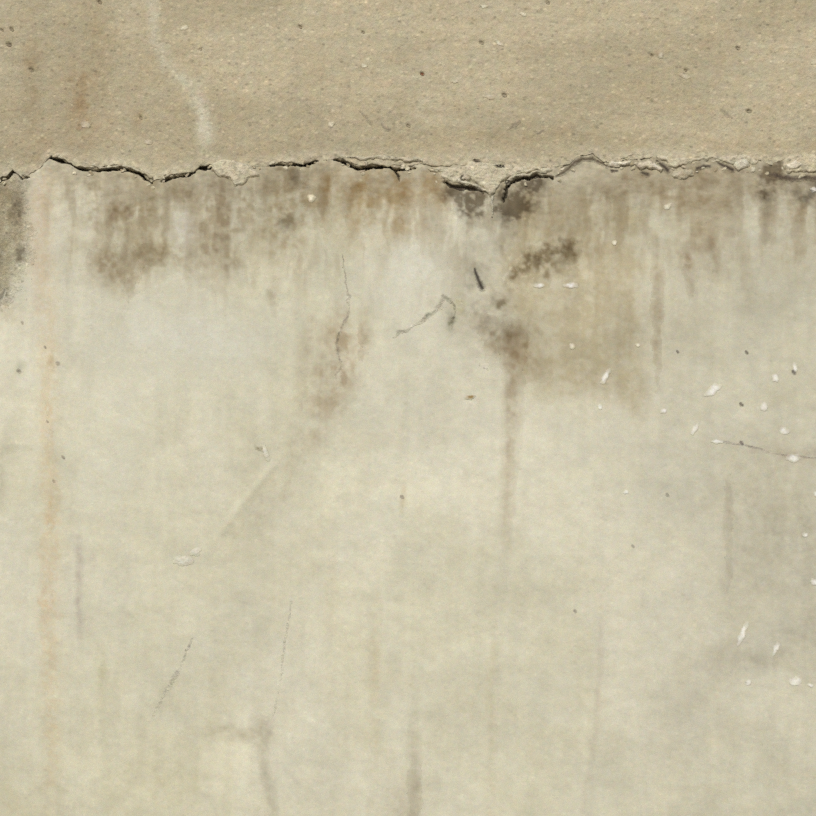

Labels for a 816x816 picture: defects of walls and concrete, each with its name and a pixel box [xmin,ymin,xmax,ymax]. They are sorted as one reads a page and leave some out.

leakage [392,119,816,157]
crack [50,157,211,182]
crack [270,159,415,178]
crack [444,182,477,191]
crack [503,156,619,203]
crack [640,159,671,178]
crack [695,162,736,173]
crack [767,172,816,183]
spalling [0,174,39,312]
crack [334,255,351,379]
crack [392,294,456,338]
leakage [49,158,816,816]